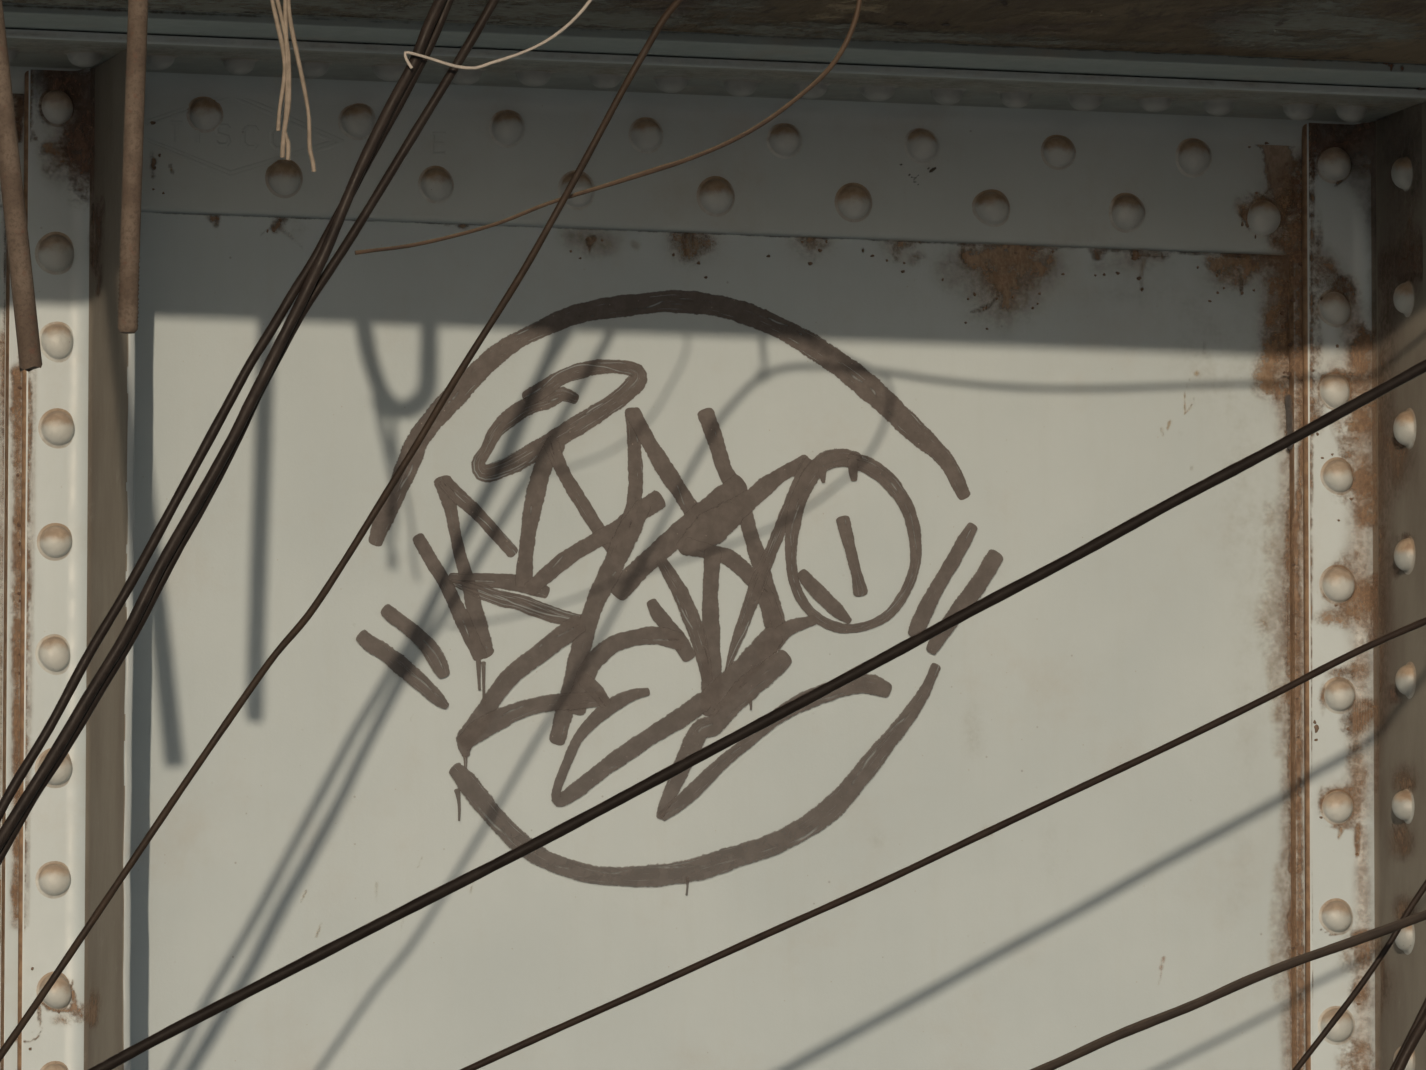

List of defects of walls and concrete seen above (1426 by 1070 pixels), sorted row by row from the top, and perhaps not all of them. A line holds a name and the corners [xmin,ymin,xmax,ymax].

rust [13,69,103,295]
rust [0,307,32,803]
rust [1197,121,1410,1070]
rust [11,821,27,918]
rust [16,982,98,1050]